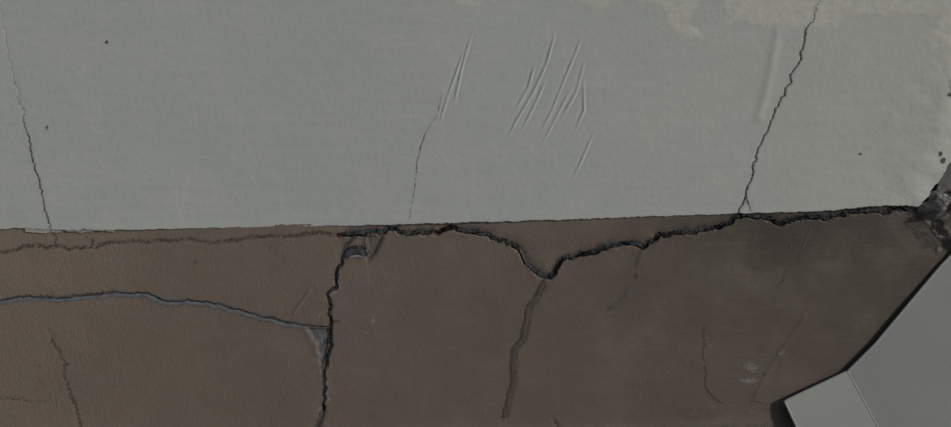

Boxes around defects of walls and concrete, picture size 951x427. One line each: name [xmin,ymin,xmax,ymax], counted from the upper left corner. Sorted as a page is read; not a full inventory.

peeling [448,0,951,102]
crack [768,2,820,129]
crack [0,108,929,427]
spalling [901,151,951,258]